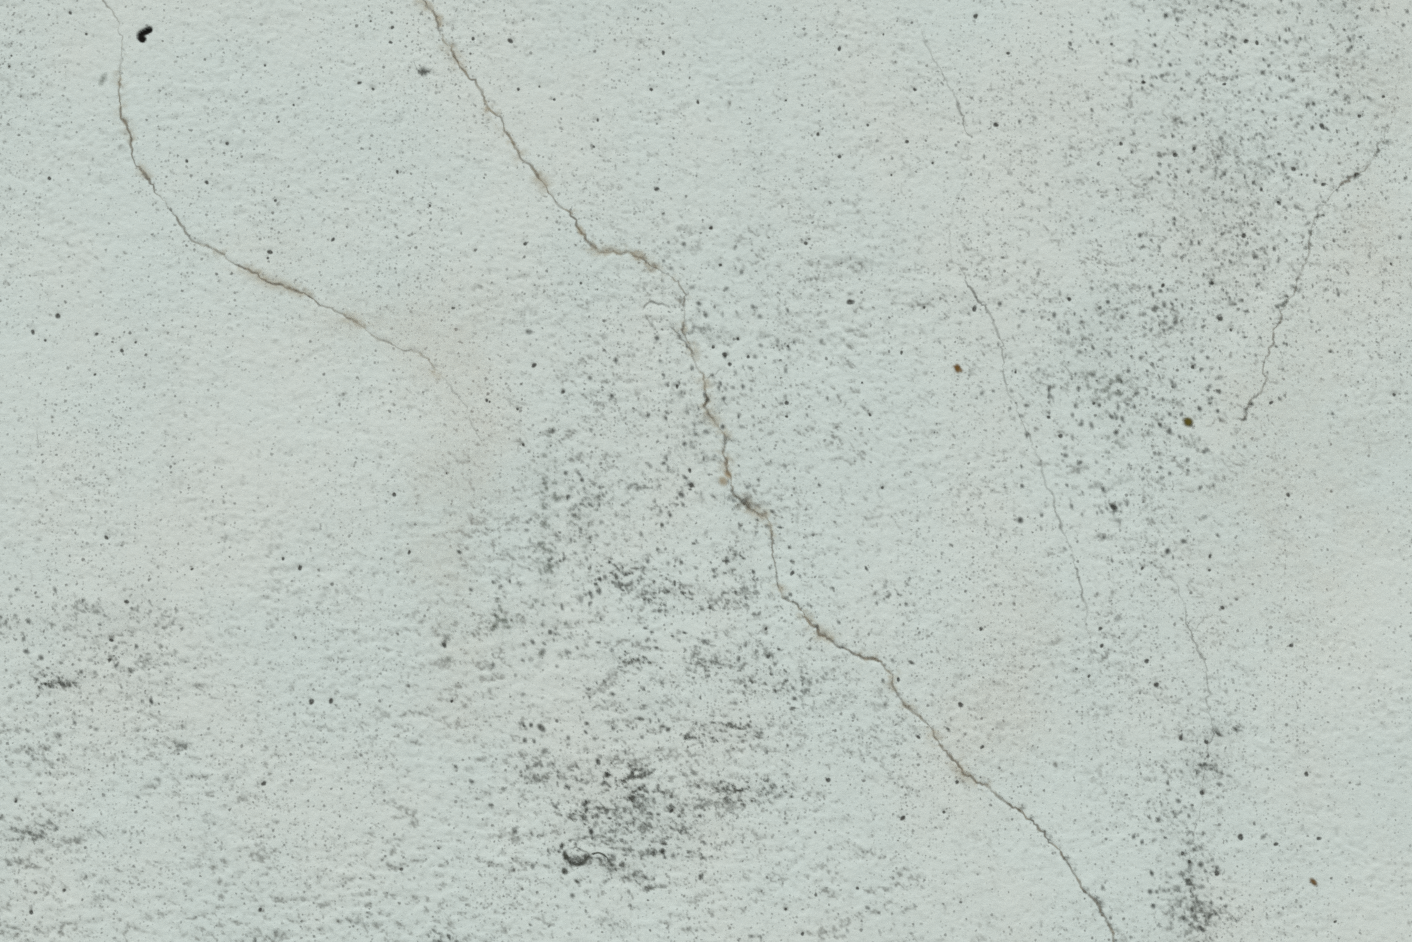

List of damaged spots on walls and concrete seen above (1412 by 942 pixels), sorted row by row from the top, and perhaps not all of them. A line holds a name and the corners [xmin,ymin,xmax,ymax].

crack [119,95,154,188]
crack [532,167,587,241]
crack [796,603,882,662]
crack [944,750,1095,900]